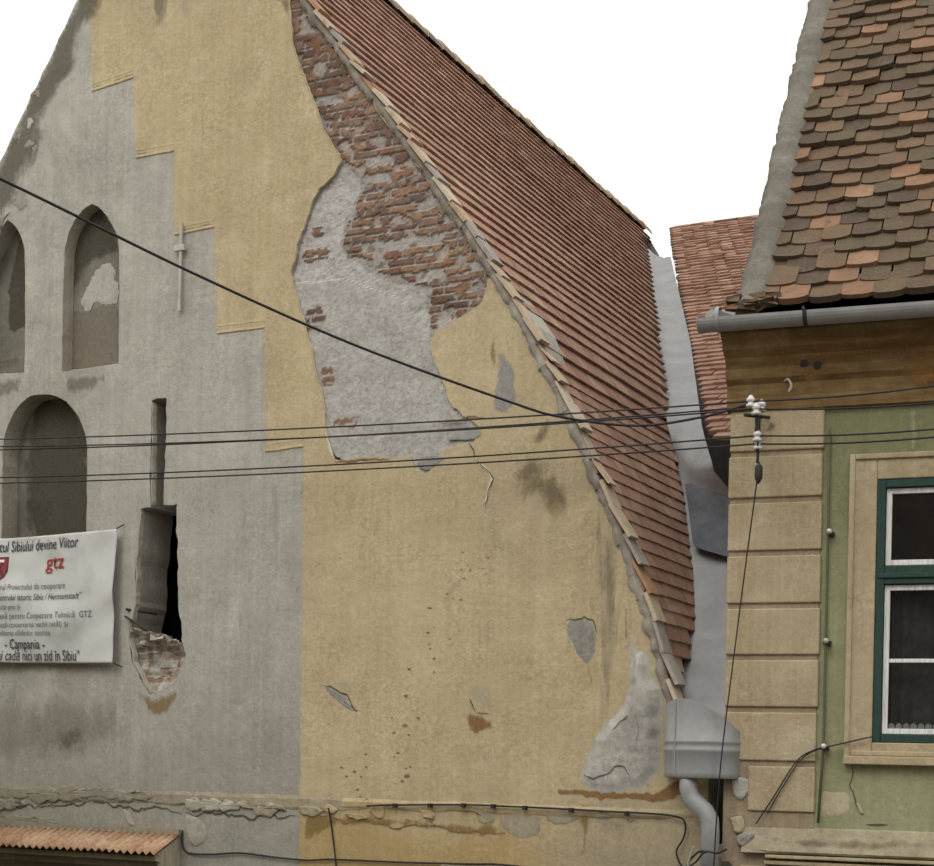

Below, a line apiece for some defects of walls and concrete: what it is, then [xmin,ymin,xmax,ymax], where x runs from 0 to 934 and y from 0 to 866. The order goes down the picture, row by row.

spalling [289,0,490,474]
peeling [72,212,119,369]
crack [468,443,494,509]
spalling [129,627,186,713]
spalling [323,681,357,712]
peeling [565,616,597,664]
peeling [0,783,581,846]